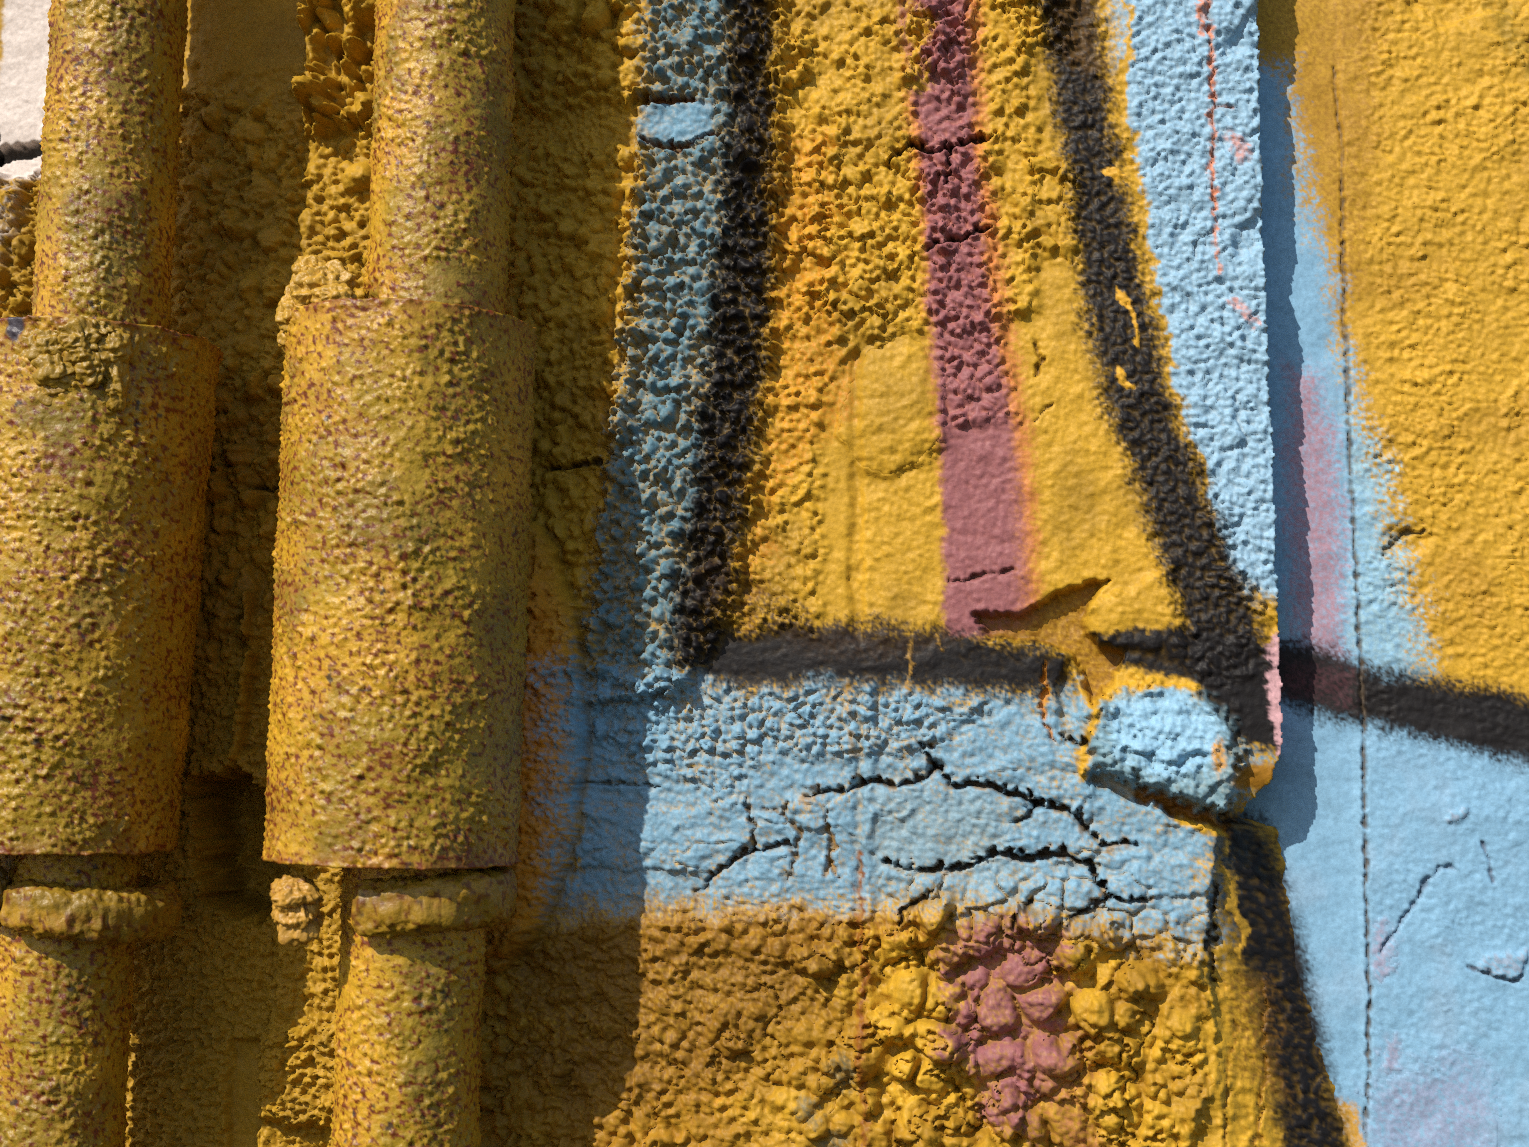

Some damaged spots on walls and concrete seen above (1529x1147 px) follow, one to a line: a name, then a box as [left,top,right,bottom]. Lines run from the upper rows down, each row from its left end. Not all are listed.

crack [889,135,992,184]
crack [927,226,992,252]
crack [694,742,1145,932]